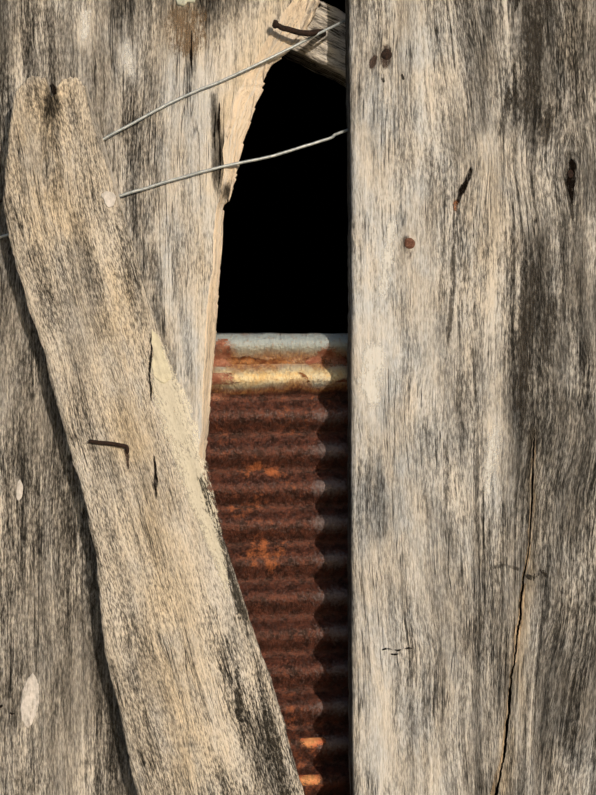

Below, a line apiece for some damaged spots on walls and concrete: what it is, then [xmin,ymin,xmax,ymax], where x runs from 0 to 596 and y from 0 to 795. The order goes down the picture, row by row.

rust [211,339,347,401]
crack [490,430,549,795]
rust [300,737,326,748]
rust [298,775,321,786]